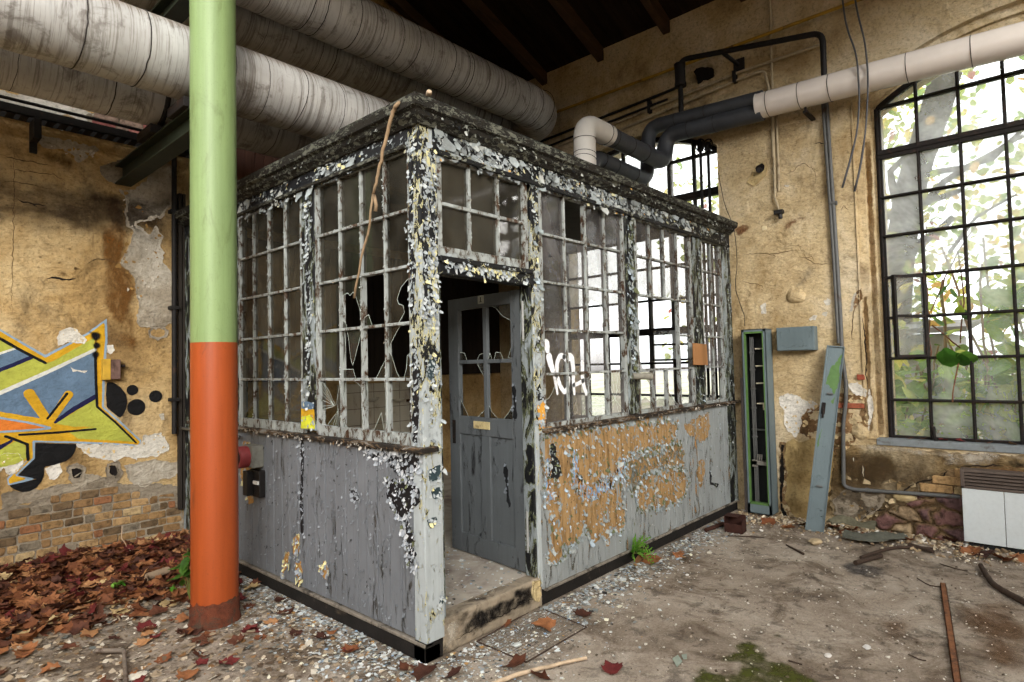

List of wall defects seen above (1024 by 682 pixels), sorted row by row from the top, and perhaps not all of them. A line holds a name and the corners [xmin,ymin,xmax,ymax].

crack [0,148,62,312]
flaking render [57,327,87,345]
crack [47,258,118,280]
leakage [103,223,134,324]
flaking render [115,163,172,330]
peeling [237,113,737,631]
flaking render [0,433,184,568]
peeling [216,393,820,682]
spalling [829,382,1024,521]